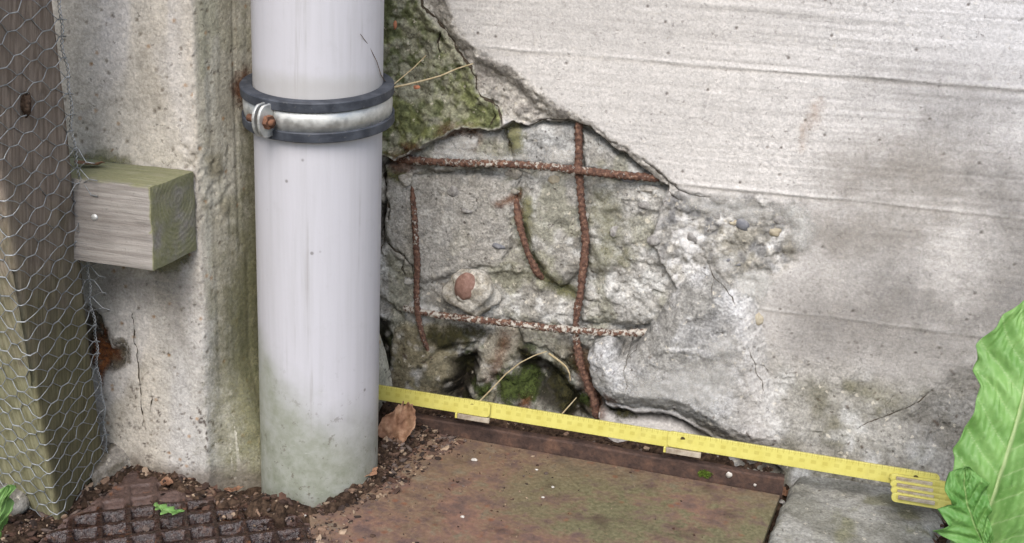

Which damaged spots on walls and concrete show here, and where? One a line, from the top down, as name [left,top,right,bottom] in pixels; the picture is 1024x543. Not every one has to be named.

spalling [379,0,808,420]
corrosion [389,122,659,419]
corrosion [92,325,121,383]
crack [131,313,153,426]
crack [857,395,926,429]